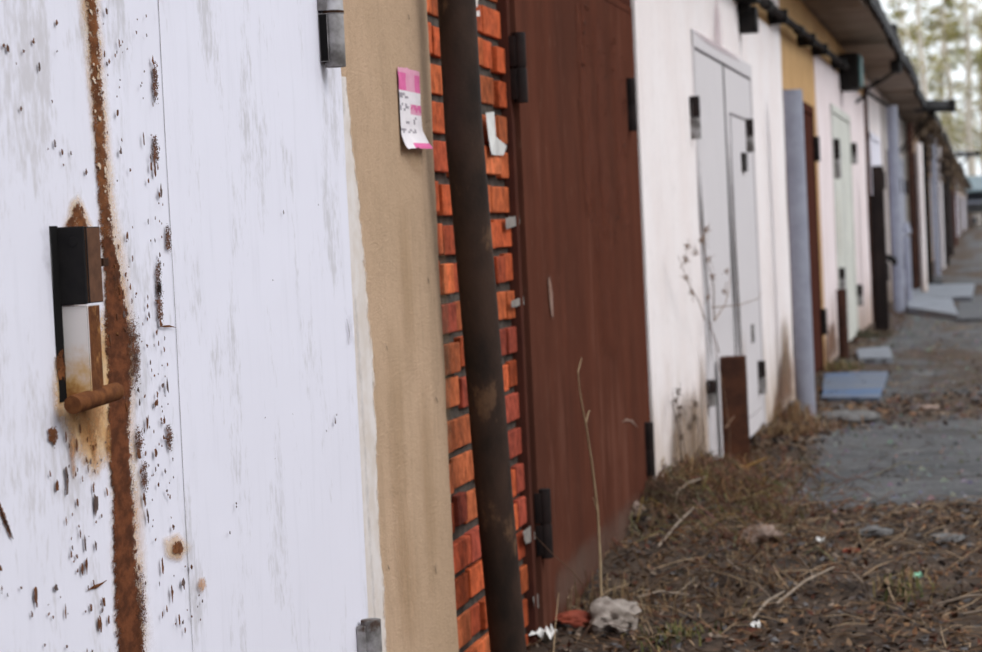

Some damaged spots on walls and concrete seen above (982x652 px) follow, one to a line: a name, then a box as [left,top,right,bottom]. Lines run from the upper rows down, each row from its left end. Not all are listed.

rust [152,60,164,104]
rust [151,118,167,165]
rust [154,191,176,321]
rust [48,0,149,652]
rust [165,415,183,461]
rust [167,532,188,558]